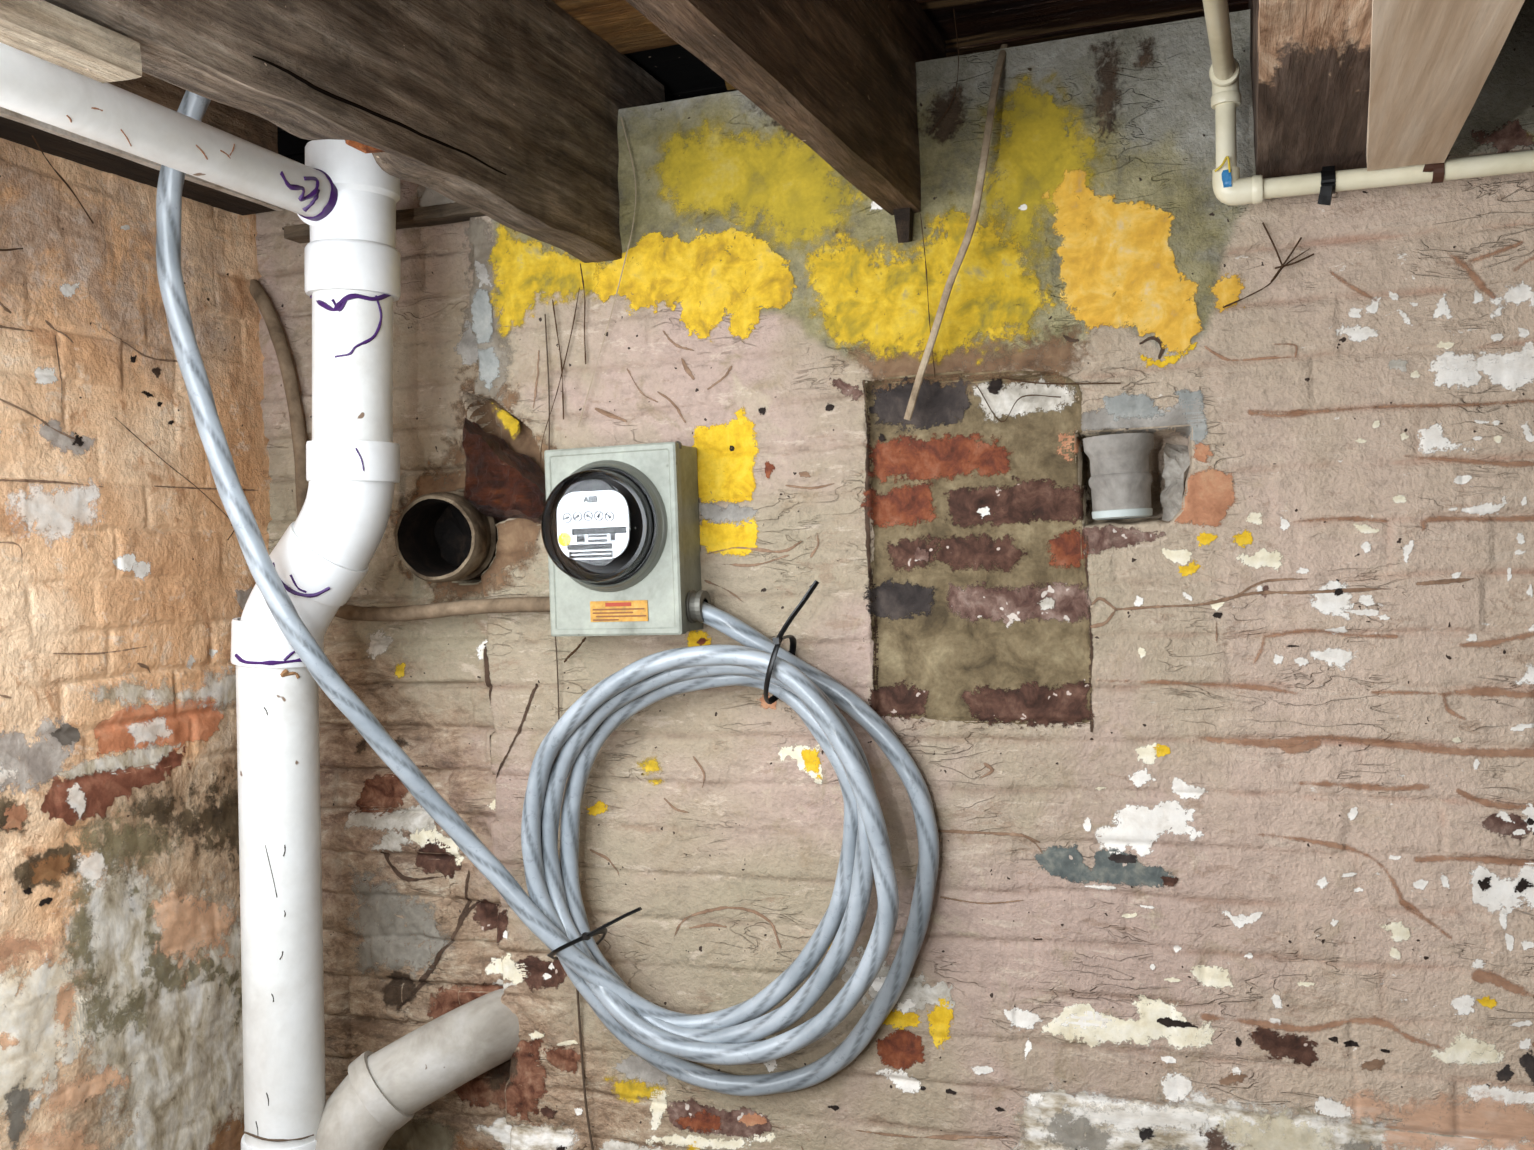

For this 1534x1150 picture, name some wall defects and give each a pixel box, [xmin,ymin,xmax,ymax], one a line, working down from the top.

peeling [1387,281,1534,391]
spalling [488,76,1309,729]
peeling [1273,580,1390,671]
leakage [89,651,302,711]
spalling [344,771,465,879]
peeling [1034,743,1208,890]
leakage [64,768,244,1150]
spalling [383,899,567,1019]
peeling [1469,861,1534,951]
leakage [4,1078,33,1150]
spalling [595,1055,778,1150]
peeling [1004,994,1534,1150]